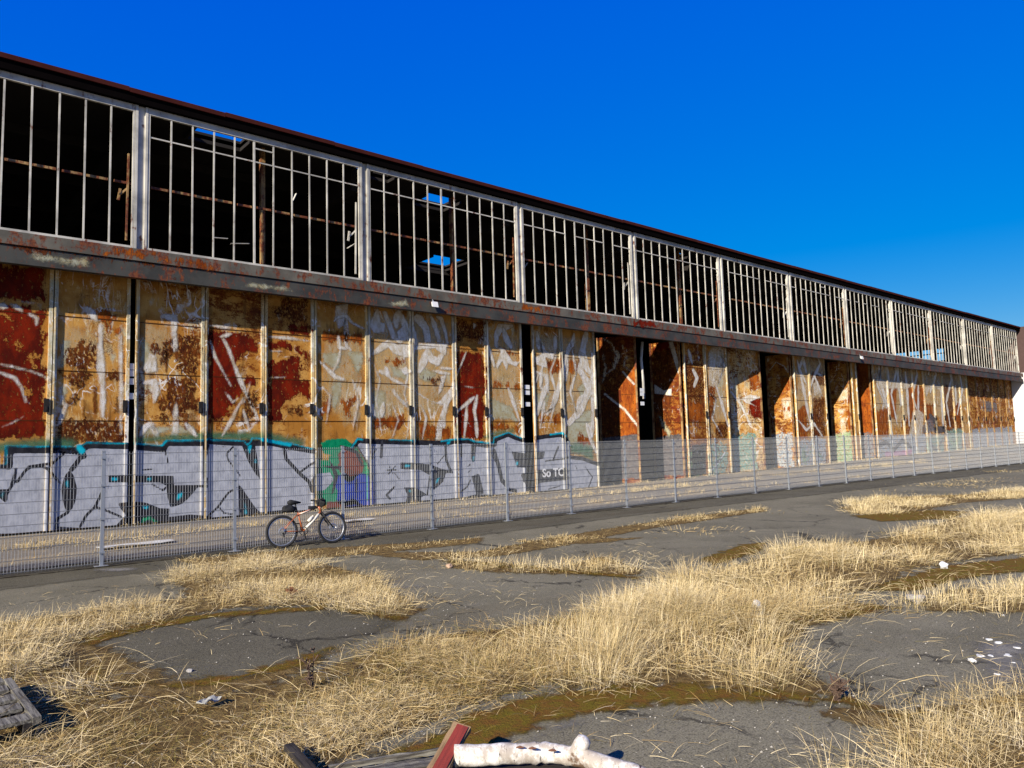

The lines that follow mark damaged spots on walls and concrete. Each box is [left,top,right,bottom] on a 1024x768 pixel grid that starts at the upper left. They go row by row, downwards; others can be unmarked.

rust [90,247,213,281]
rust [0,245,128,450]
rust [150,297,362,430]
rust [373,414,405,430]
rust [418,303,520,441]
rust [546,357,581,383]
rust [577,337,640,471]
rust [652,342,728,449]